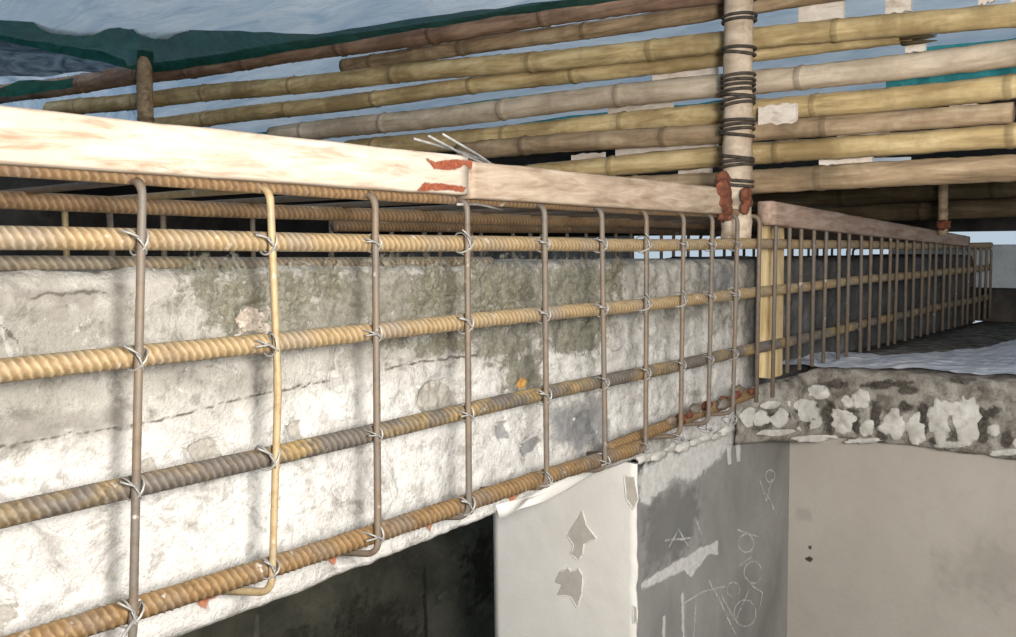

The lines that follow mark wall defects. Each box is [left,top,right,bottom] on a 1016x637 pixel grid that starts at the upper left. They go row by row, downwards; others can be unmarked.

spalling [635,377,1016,465]
flaking render [623,475,638,510]
water stain [462,533,494,605]
flaking render [555,510,597,608]